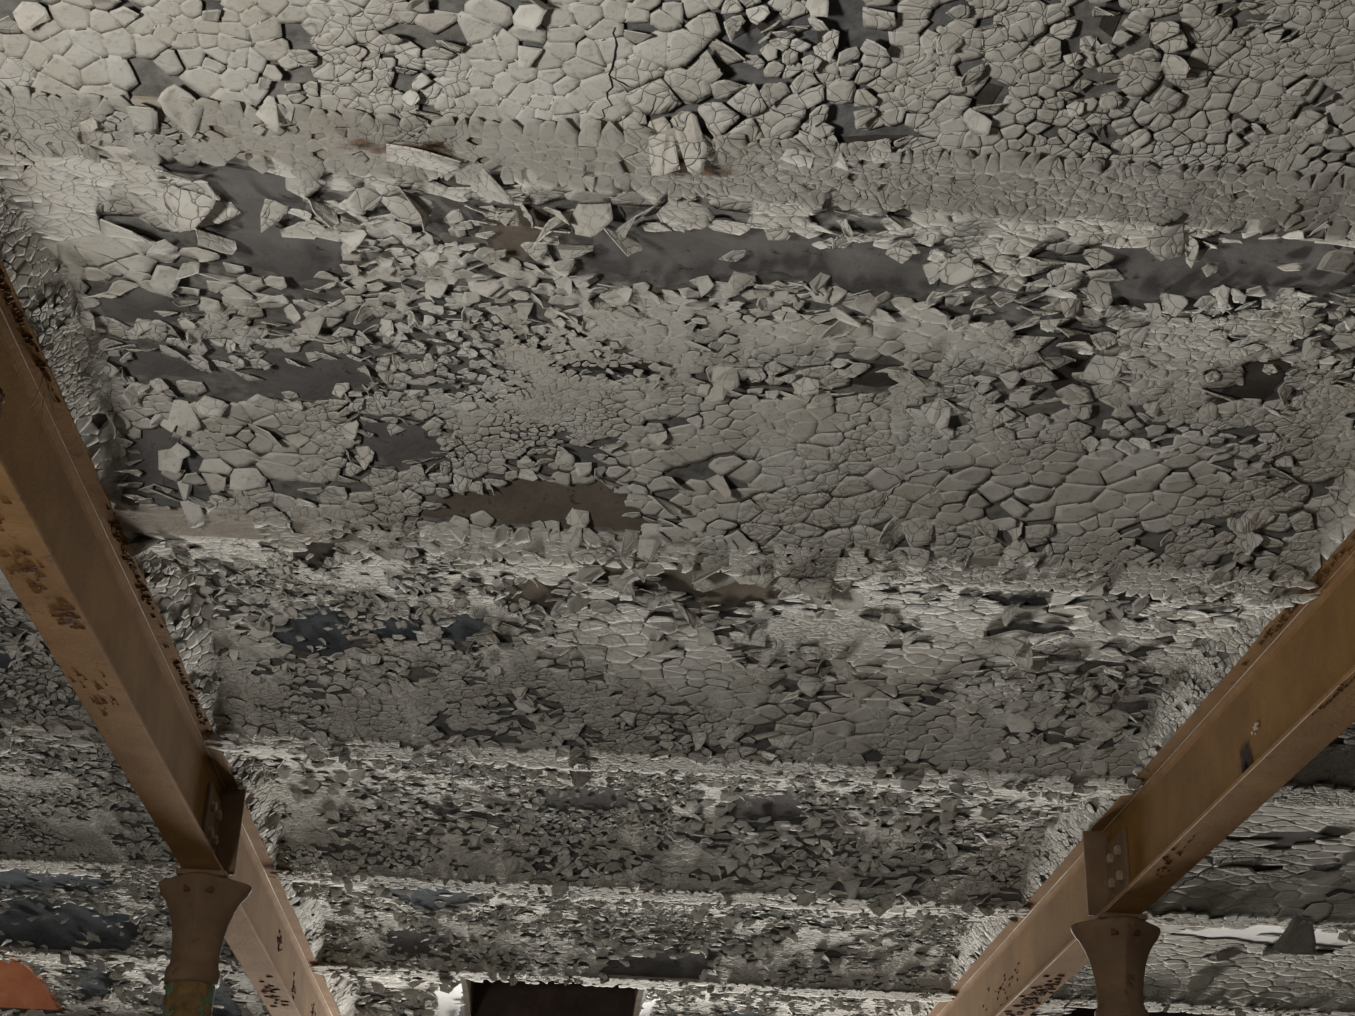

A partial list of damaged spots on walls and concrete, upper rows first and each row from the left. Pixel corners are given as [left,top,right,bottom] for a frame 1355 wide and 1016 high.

peeling [0,0,1355,194]
crack [0,27,1355,242]
rust [50,601,86,630]
peeling [0,141,1355,781]
crack [258,465,1320,609]
peeling [0,569,271,1016]
peeling [223,742,1120,1016]
peeling [1143,722,1355,1016]